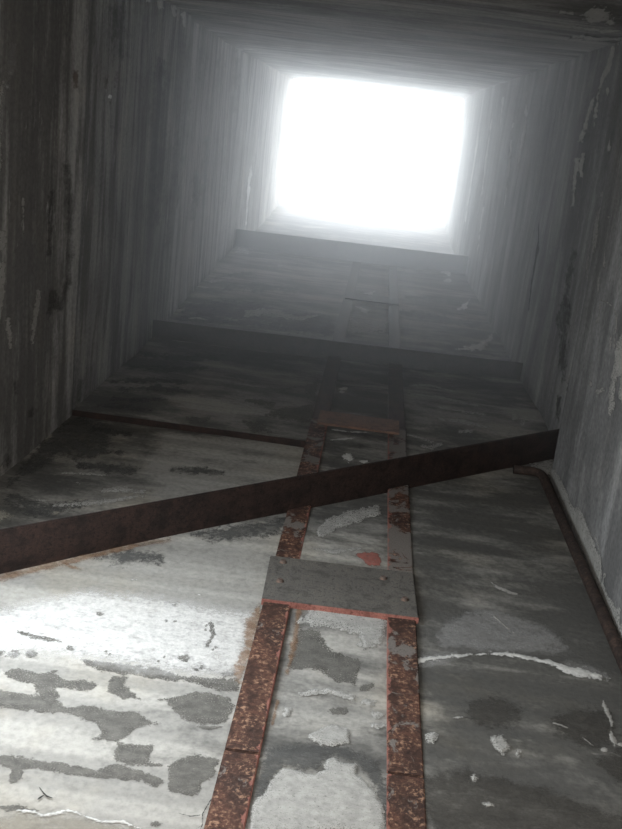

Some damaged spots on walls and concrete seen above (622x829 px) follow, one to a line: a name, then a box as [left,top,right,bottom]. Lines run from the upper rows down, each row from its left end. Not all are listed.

peeling [595,330,622,415]
leakage [4,417,140,517]
leakage [170,466,224,475]
leakage [0,592,251,672]
leakage [418,651,611,681]
leakage [551,708,622,781]
leakage [422,770,622,829]